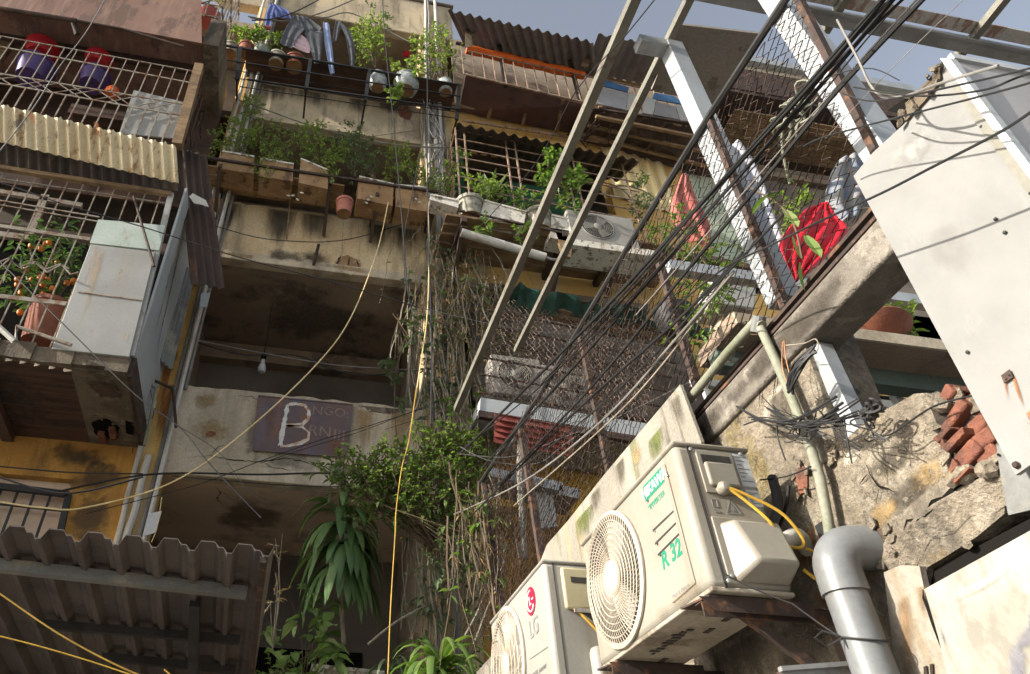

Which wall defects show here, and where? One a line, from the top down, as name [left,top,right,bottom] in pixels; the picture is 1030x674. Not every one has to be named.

leakage [225,203,238,226]
leakage [269,209,324,235]
leakage [271,251,322,261]
corrosion [1001,369,1021,399]
spalling [922,384,1000,489]
crack [860,463,894,501]
leakage [72,505,106,539]
leakage [224,503,277,526]
crack [904,477,979,529]